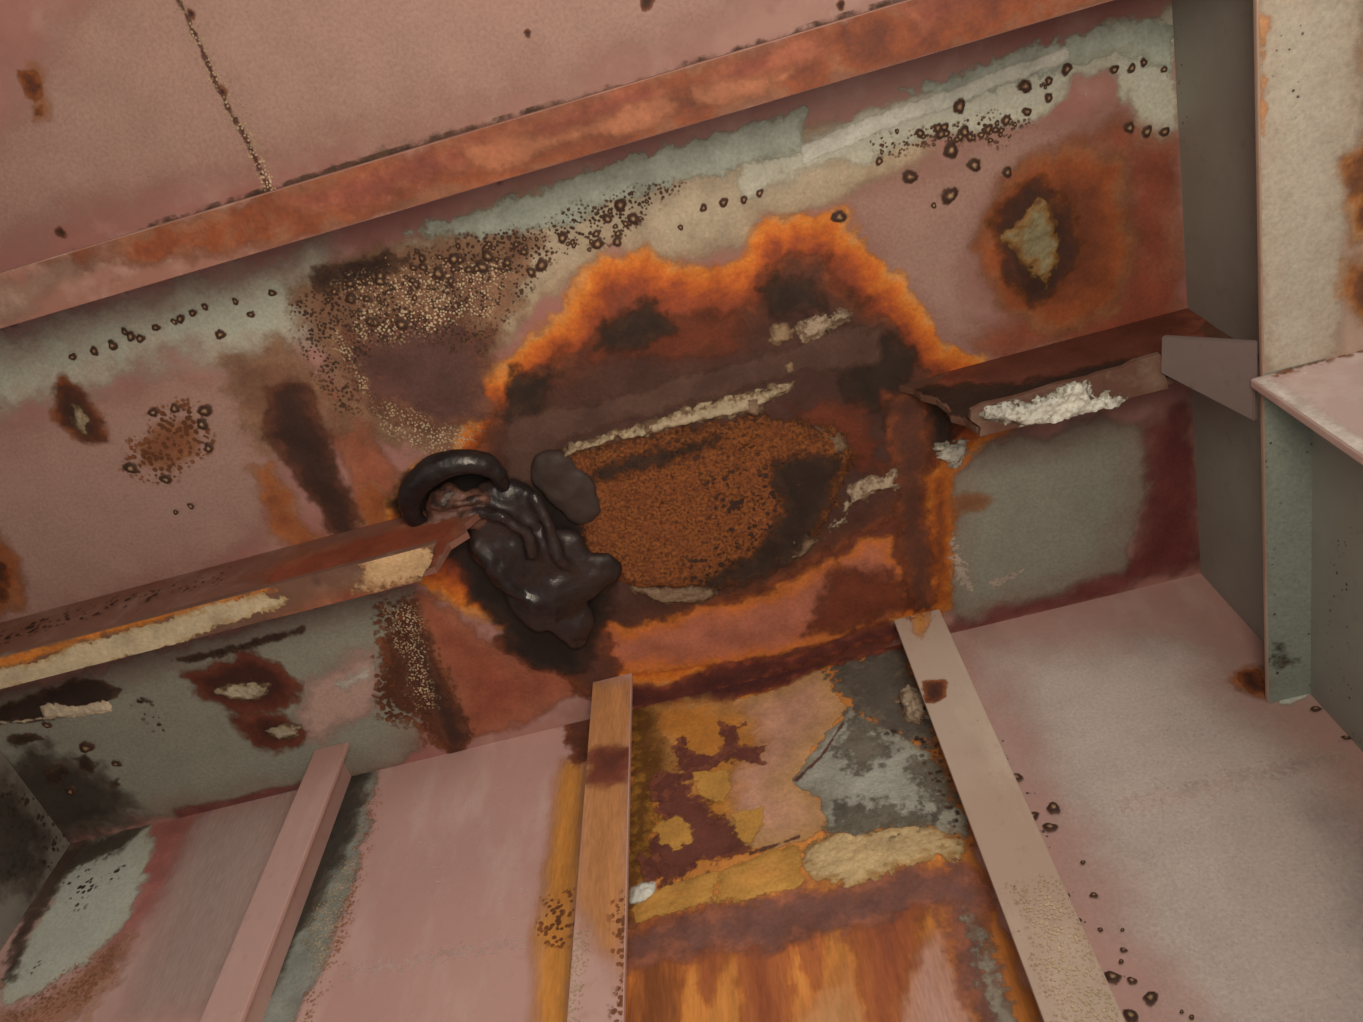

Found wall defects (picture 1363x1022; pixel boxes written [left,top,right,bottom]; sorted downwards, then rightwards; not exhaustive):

spalling [640,0,655,11]
rust [18,68,48,117]
crack [175,0,278,191]
rust [44,0,1110,270]
spalling [54,226,67,238]
rust [121,398,216,484]
rust [222,182,1207,1022]
peeling [630,648,971,923]
rust [0,936,132,1022]